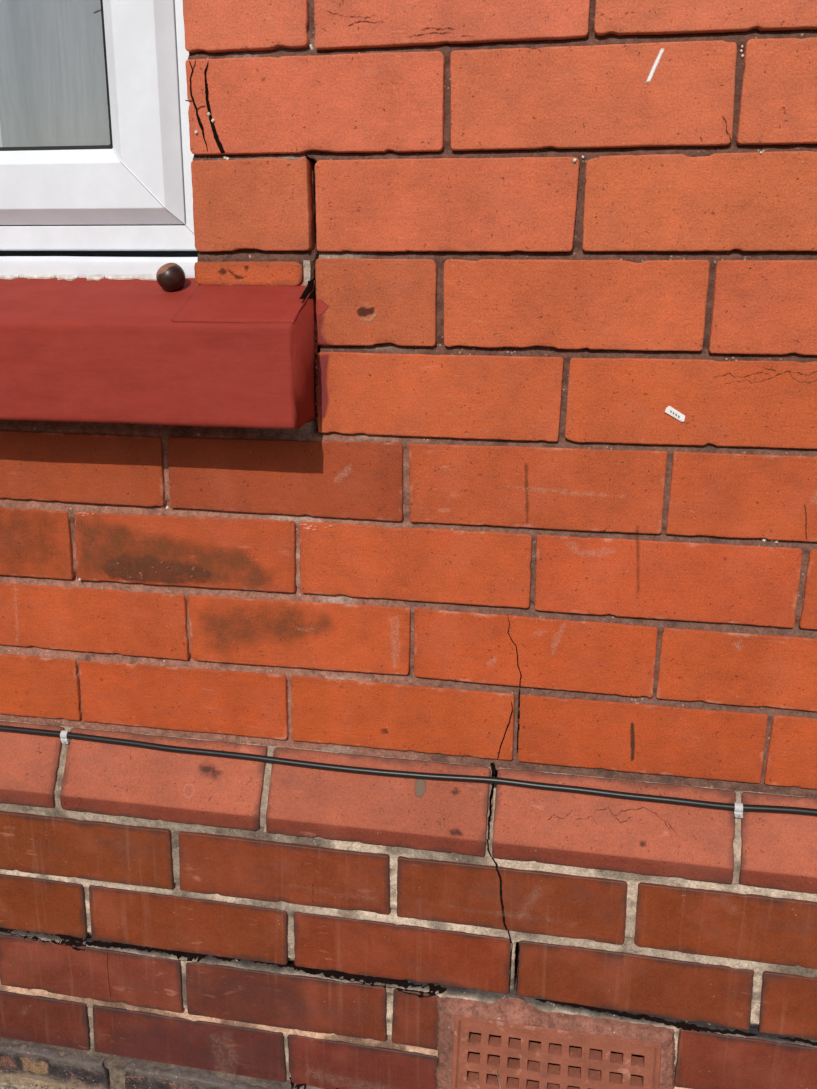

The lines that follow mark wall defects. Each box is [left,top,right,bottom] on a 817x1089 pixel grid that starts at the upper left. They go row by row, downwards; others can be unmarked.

crack [185,60,225,155]
crack [299,277,316,299]
crack [487,614,817,1046]
crack [0,928,447,998]
crack [289,1077,306,1089]